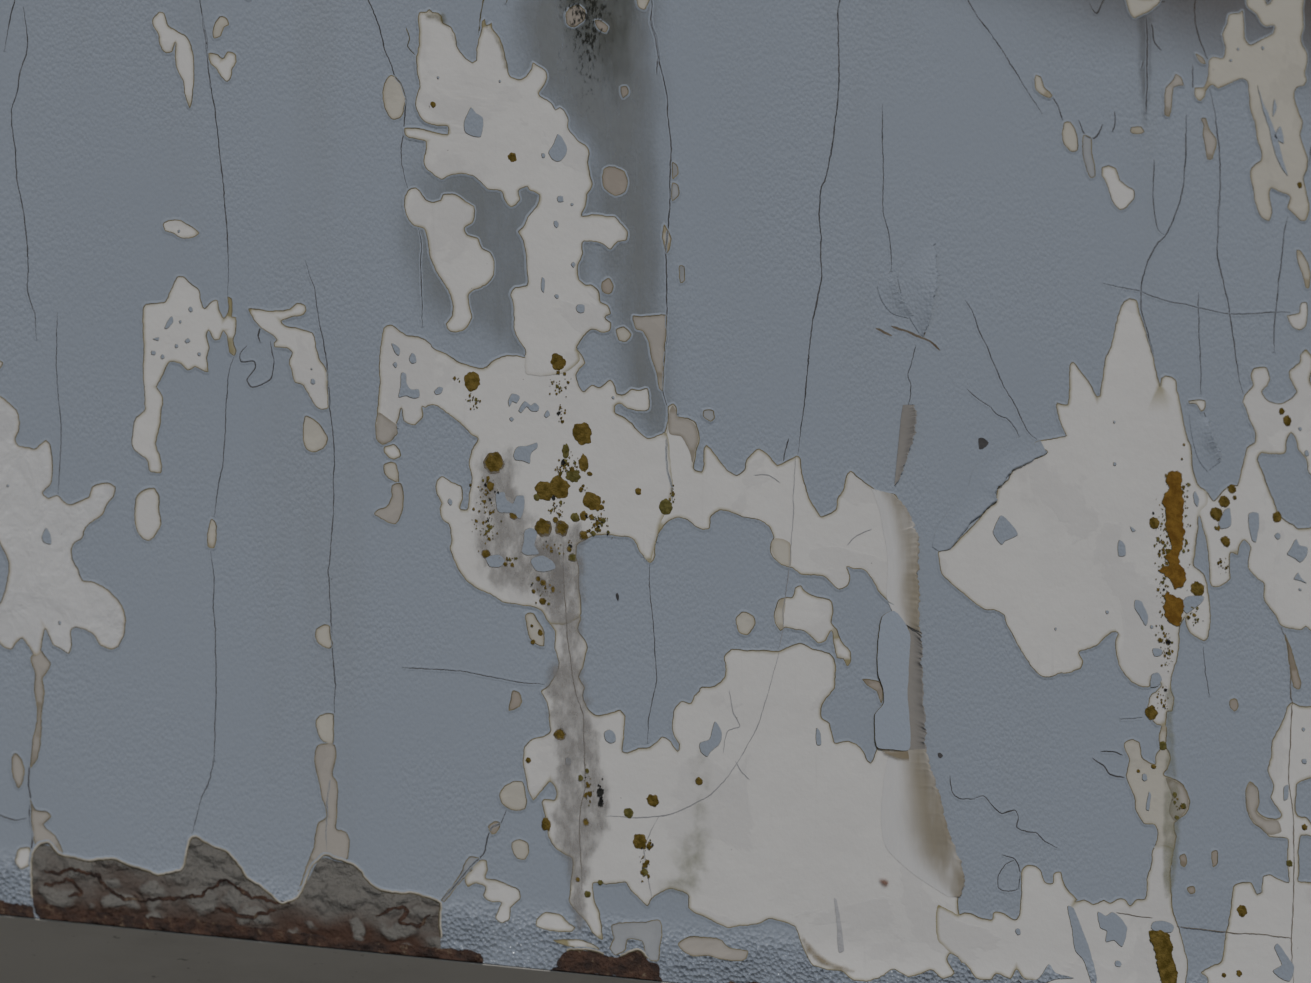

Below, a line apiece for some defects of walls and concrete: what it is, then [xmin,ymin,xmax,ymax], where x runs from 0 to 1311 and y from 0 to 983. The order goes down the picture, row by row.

peeling [160,217,202,241]
spalling [0,274,523,949]
peeling [371,0,1311,983]